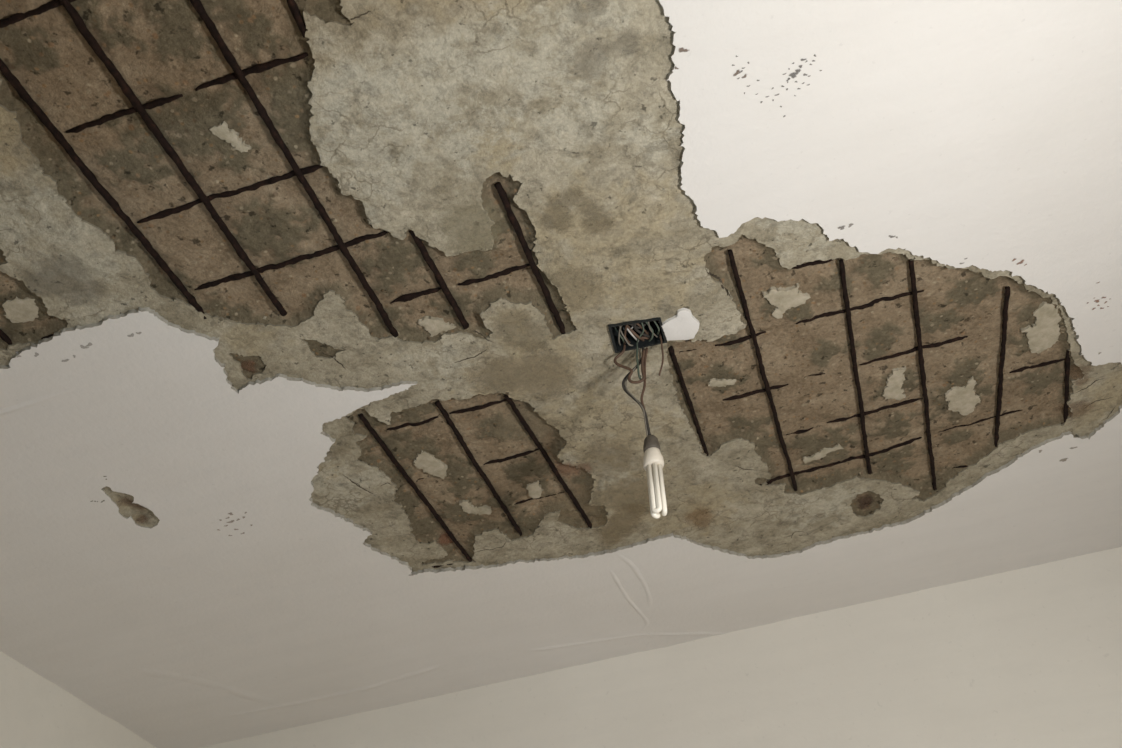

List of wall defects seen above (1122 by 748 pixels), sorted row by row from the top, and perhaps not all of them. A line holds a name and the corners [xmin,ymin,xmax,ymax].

peeling [0,0,1122,576]